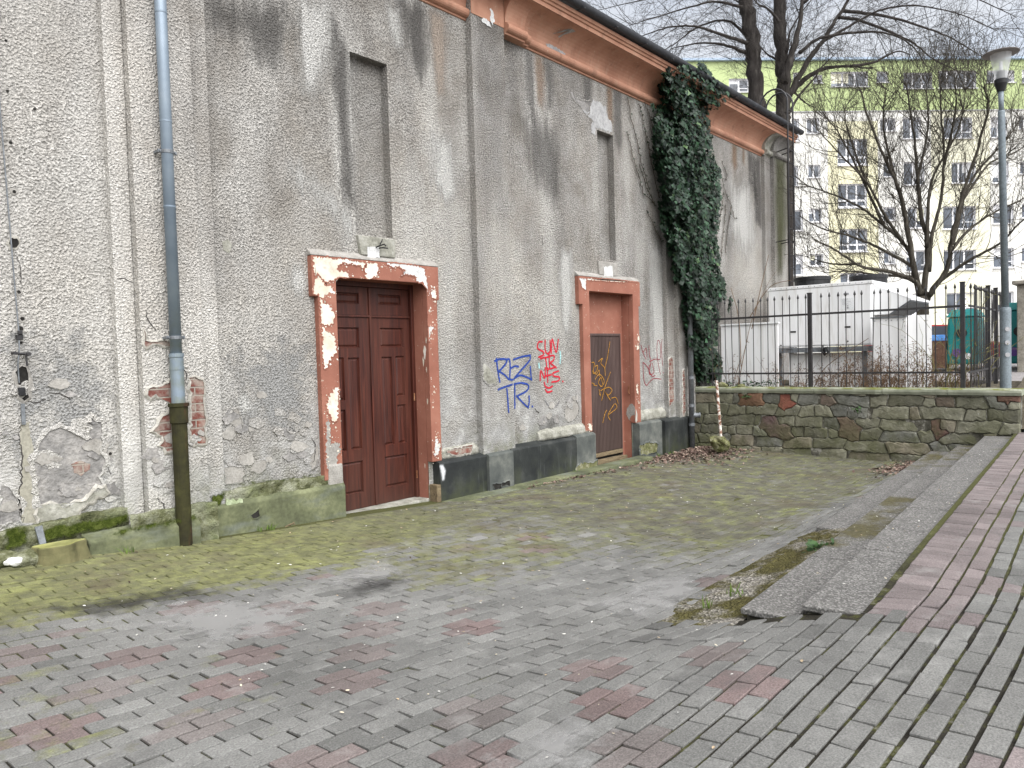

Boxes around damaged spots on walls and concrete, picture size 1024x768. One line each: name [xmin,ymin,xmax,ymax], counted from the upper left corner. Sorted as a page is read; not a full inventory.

peeling [569,90,612,135]
peeling [0,364,77,404]
flaking render [0,412,121,528]
flaking render [140,378,174,494]
peeling [311,247,437,408]